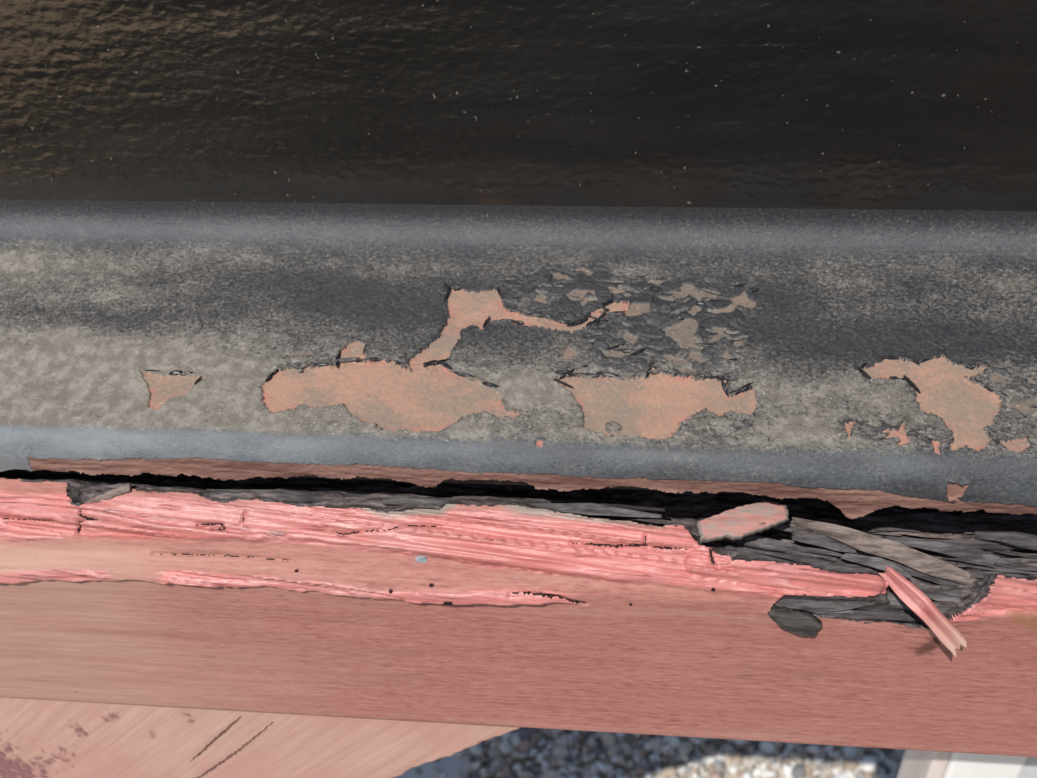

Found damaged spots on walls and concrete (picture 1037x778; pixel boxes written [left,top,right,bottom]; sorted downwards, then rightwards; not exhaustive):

peeling [141,370,207,410]
peeling [262,255,777,449]
peeling [827,349,1037,455]
spalling [0,457,1037,629]
damp [0,744,74,778]
crack [191,716,273,778]